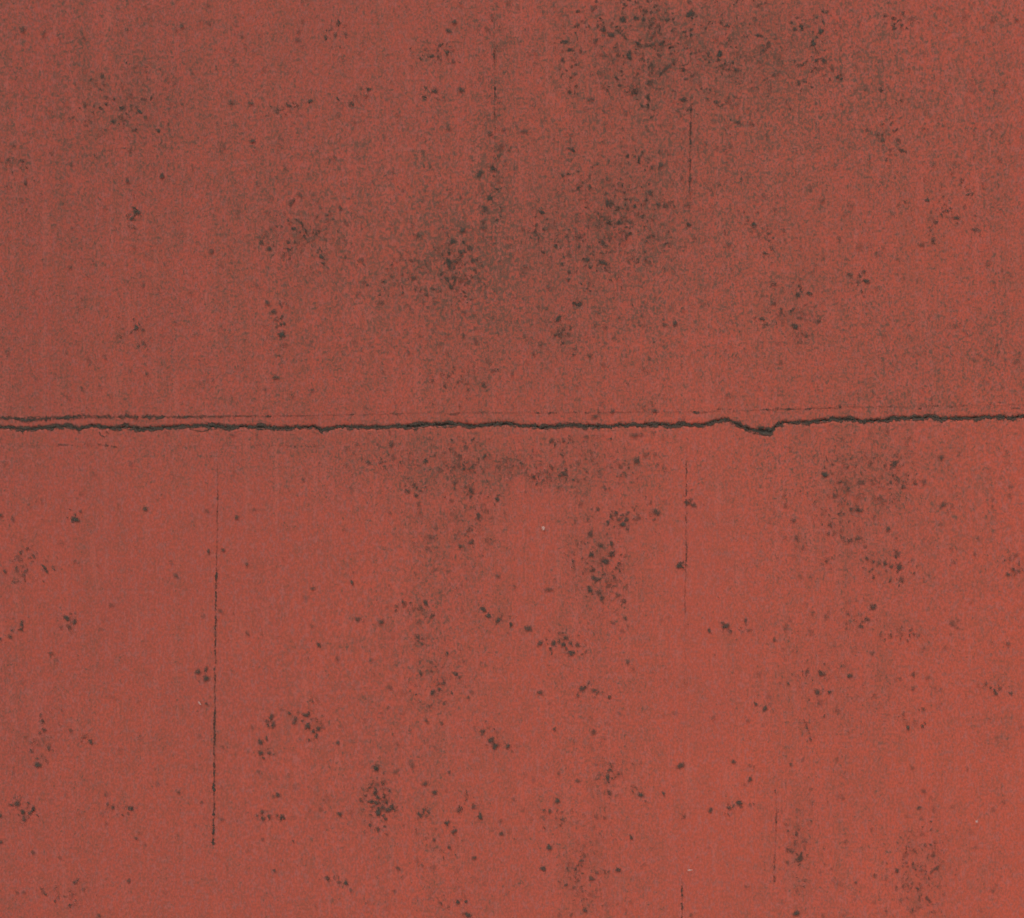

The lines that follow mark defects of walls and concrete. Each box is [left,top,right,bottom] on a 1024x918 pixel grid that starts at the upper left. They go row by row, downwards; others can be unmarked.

crack [0,402,1024,447]